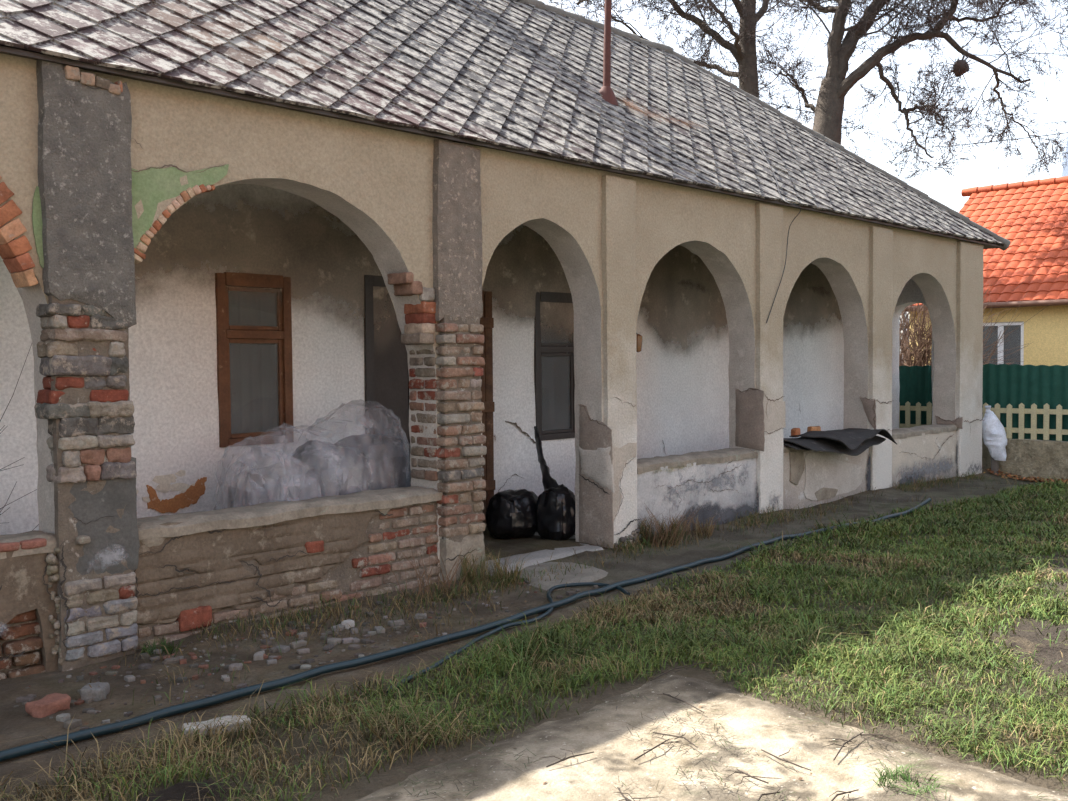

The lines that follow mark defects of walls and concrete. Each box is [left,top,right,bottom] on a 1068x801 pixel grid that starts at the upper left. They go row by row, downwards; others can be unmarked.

spalling [0,176,44,288]
peeling [131,164,229,264]
spalling [34,303,207,547]
spalling [64,272,487,662]
crack [505,421,536,444]
spalling [578,404,642,548]
spalling [735,388,765,452]
spalling [0,538,47,552]
crack [134,529,309,607]
spalling [0,609,46,680]